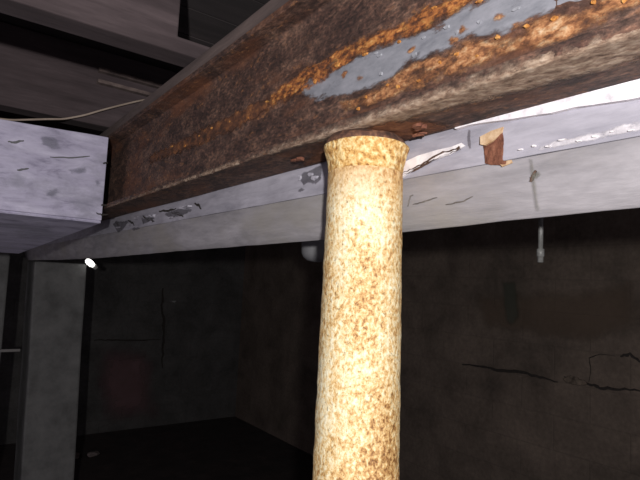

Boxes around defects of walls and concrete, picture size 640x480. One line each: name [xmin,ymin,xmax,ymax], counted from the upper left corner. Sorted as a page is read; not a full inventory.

peeling [302,0,581,101]
corrosion [341,0,640,111]
corrosion [149,0,483,164]
corrosion [287,30,640,148]
corrosion [184,161,239,181]
corrosion [290,150,326,167]
peeling [298,166,321,191]
peeling [403,130,471,178]
spalling [480,127,513,167]
peeling [113,203,201,232]
crack [462,352,640,392]